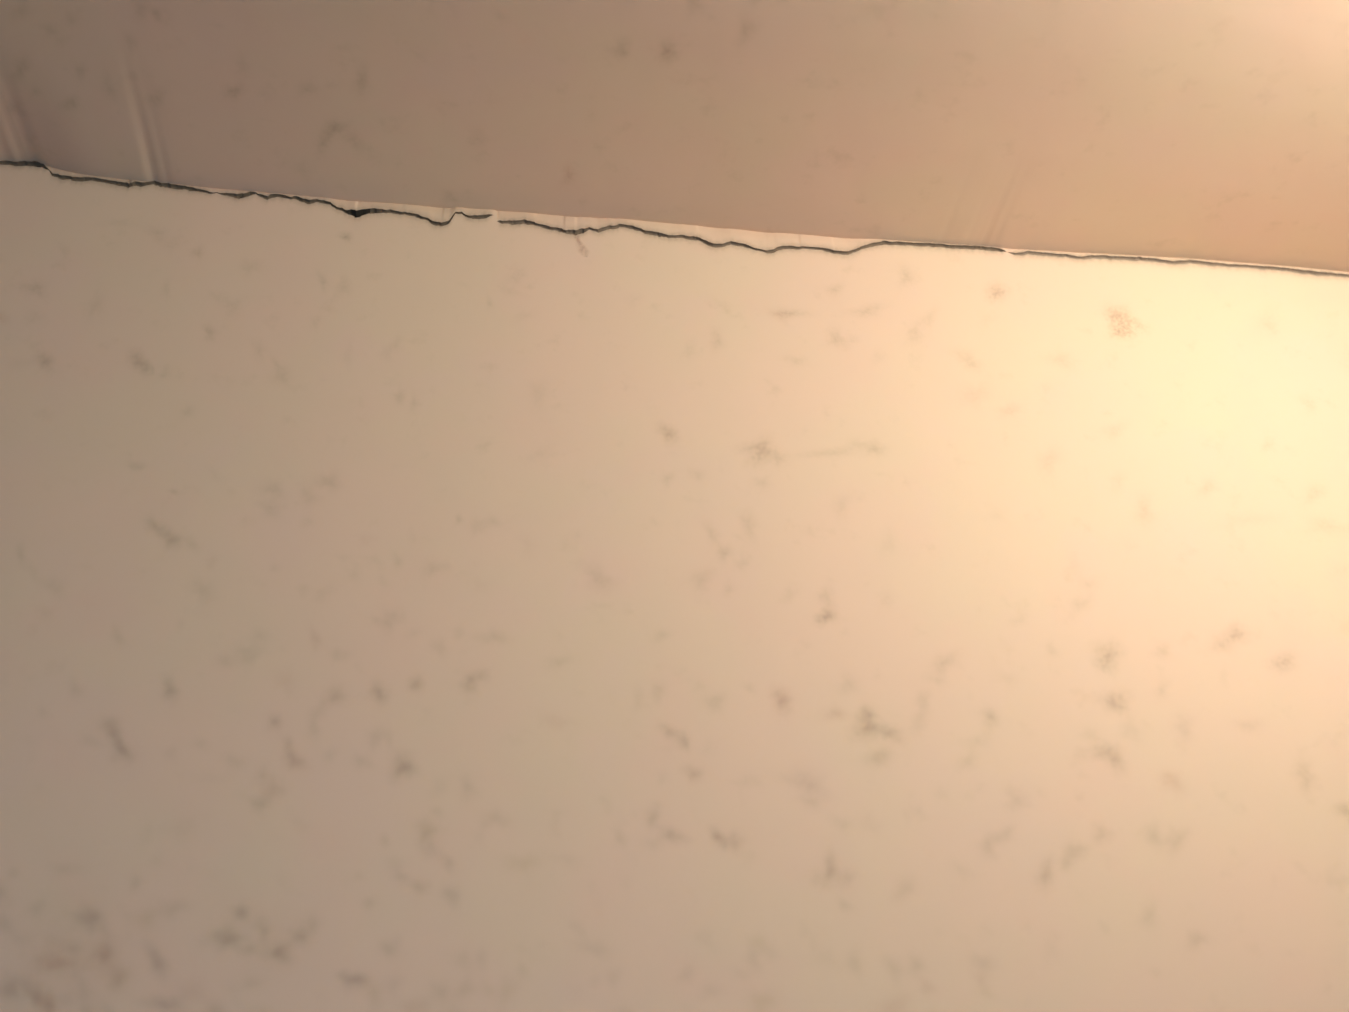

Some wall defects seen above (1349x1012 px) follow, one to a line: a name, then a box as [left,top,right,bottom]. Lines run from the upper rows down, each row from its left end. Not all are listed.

crack [0,161,1349,277]